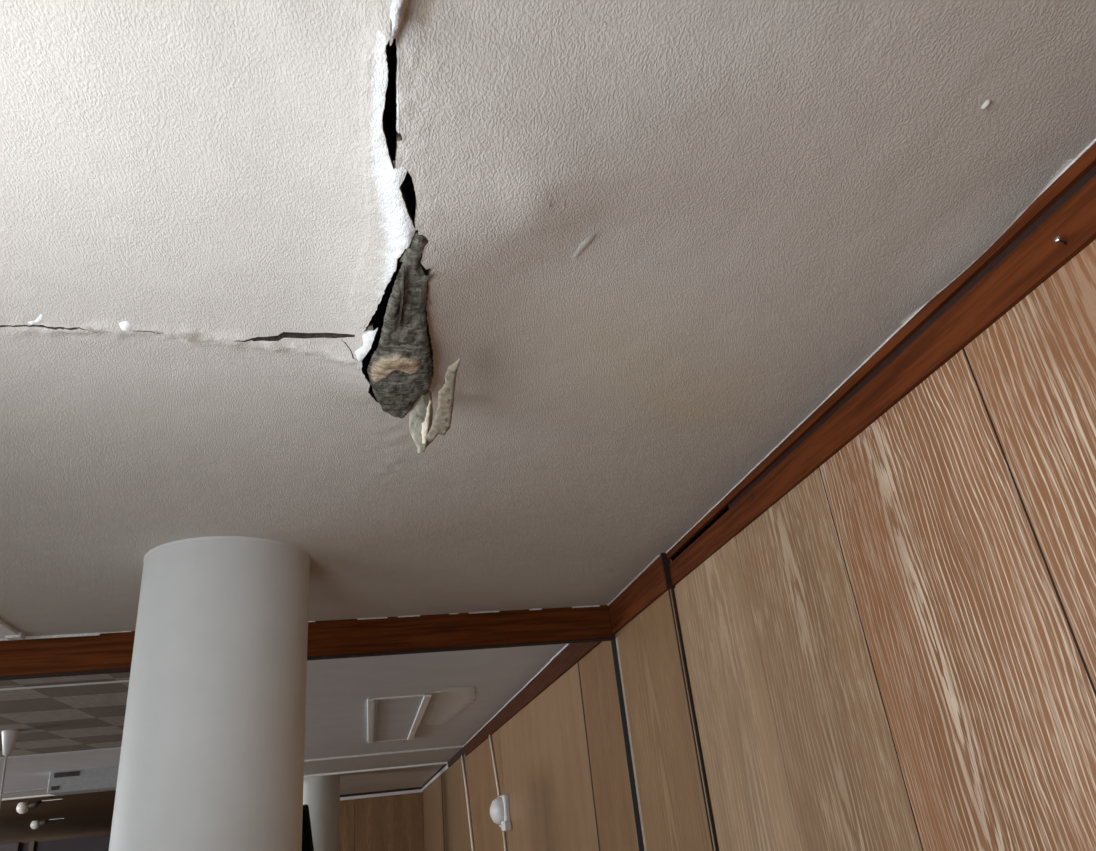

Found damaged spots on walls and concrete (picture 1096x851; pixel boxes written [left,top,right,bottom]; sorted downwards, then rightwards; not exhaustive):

crack [237,0,417,361]
crack [0,314,207,344]
spalling [355,230,461,454]